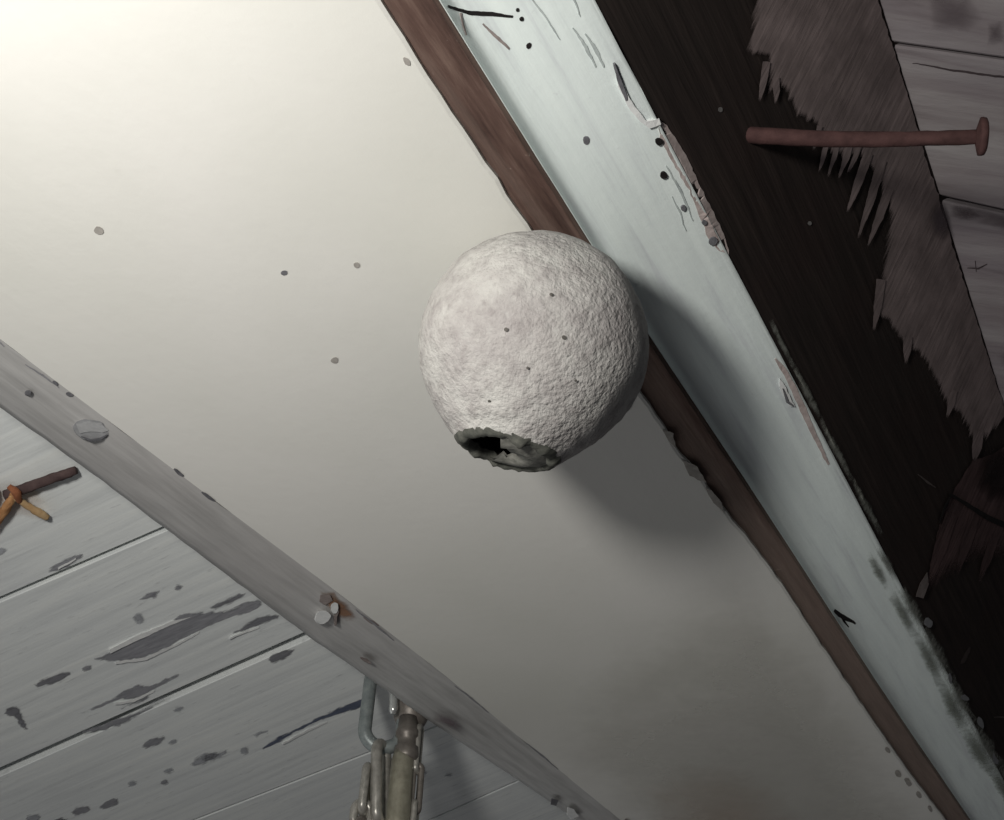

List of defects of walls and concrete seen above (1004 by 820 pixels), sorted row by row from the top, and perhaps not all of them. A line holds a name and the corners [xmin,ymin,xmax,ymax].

peeling [572,28,729,255]
peeling [773,326,848,474]
spalling [314,595,379,626]
peeling [82,594,278,671]
peeling [269,650,293,663]
peeling [36,673,70,687]
peeling [5,707,27,729]
peeling [83,675,178,733]
peeling [256,700,361,749]
peeling [144,737,176,748]
peeling [192,751,226,765]
peeling [56,799,118,820]